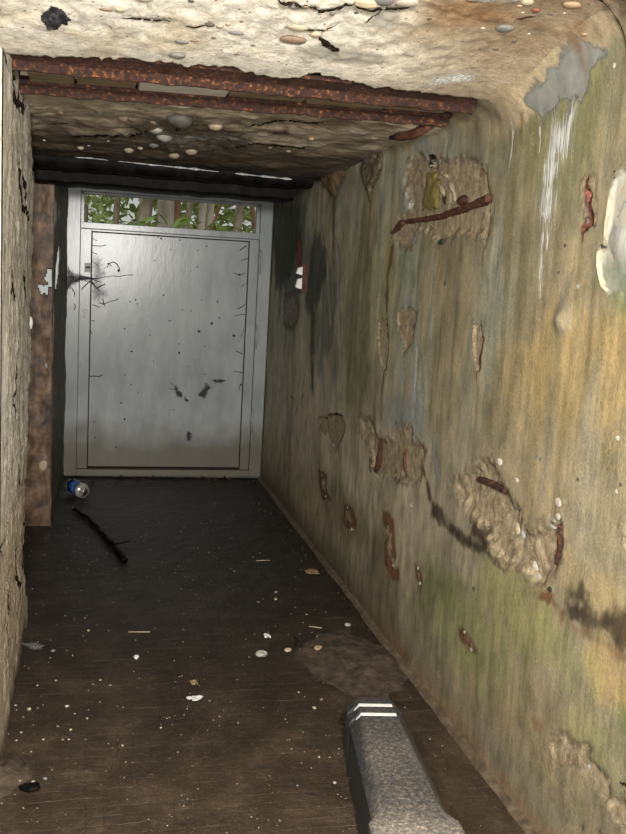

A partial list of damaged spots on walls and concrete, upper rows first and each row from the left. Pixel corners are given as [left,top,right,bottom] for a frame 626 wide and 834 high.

crack [278,0,410,32]
crack [600,0,626,44]
crack [225,120,323,150]
spalling [391,149,493,251]
damp [539,96,577,296]
flaking render [579,170,626,295]
spalling [358,416,426,487]
corrosion [383,511,399,580]
damp [423,467,499,565]
spalling [447,455,564,602]
damp [568,582,626,650]
spalling [545,730,626,834]